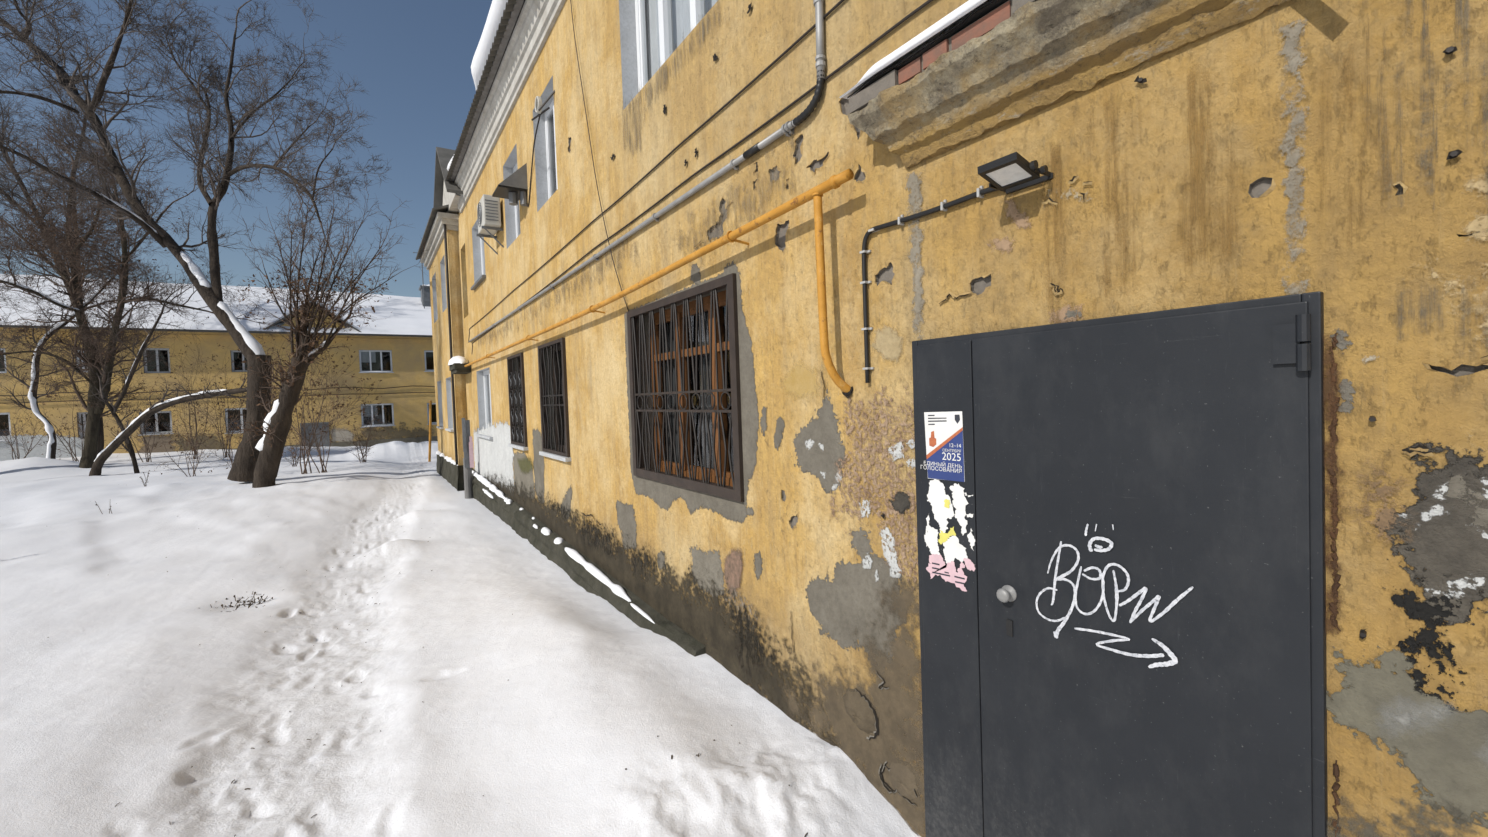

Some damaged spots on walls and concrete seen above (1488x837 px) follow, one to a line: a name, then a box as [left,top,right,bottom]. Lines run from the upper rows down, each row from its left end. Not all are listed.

flaking render [752,134,830,190]
flaking render [707,196,734,242]
flaking render [774,220,790,255]
flaking render [968,272,994,297]
peeling [830,387,918,592]
rust [1323,333,1343,633]
peeling [721,549,758,623]
damp [484,470,926,837]
rust [1331,760,1341,837]